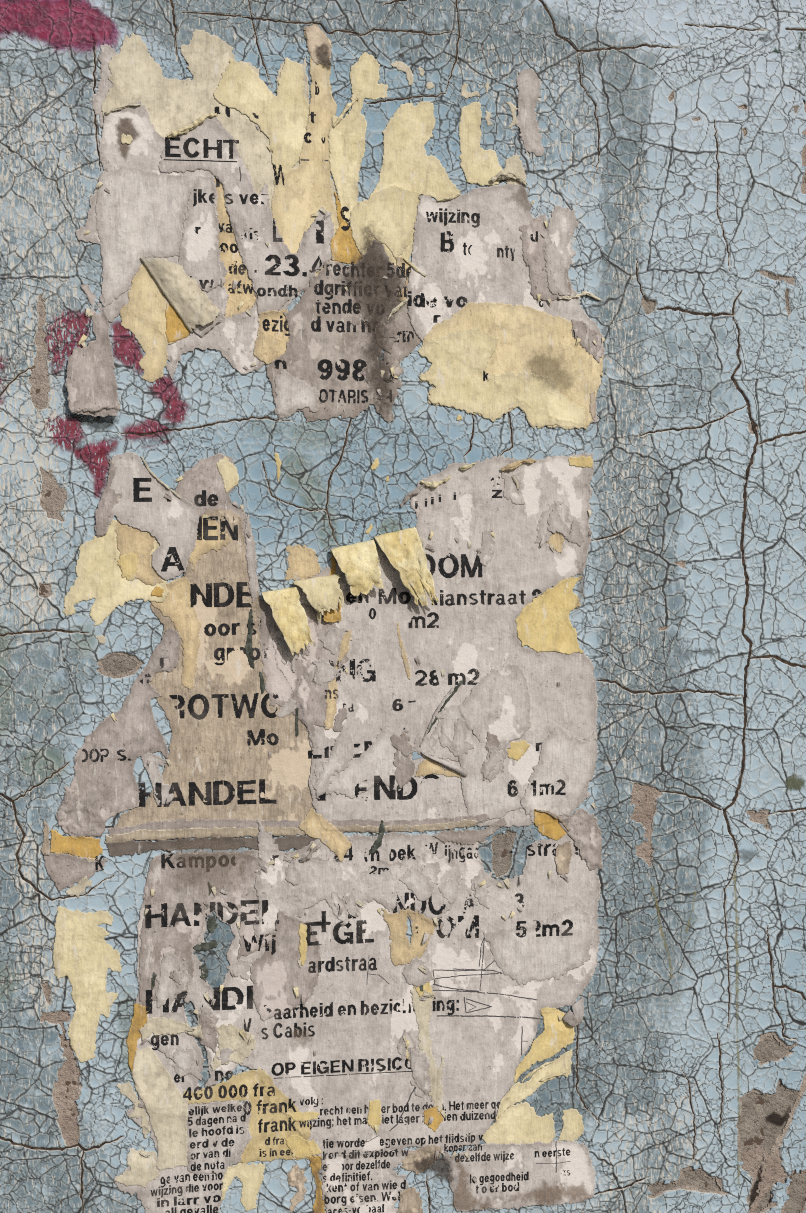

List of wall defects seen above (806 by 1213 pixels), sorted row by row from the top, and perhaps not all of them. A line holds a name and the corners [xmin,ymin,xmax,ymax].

crack [93,43,101,171]
crack [170,0,460,104]
crack [539,0,806,170]
crack [121,417,291,436]
crack [262,418,352,545]
crack [464,412,513,457]
crack [597,120,806,1159]
crack [0,762,112,901]
peeling [630,783,662,867]
crack [0,1136,123,1213]
spalling [648,1164,730,1198]
spalling [736,1032,806,1213]